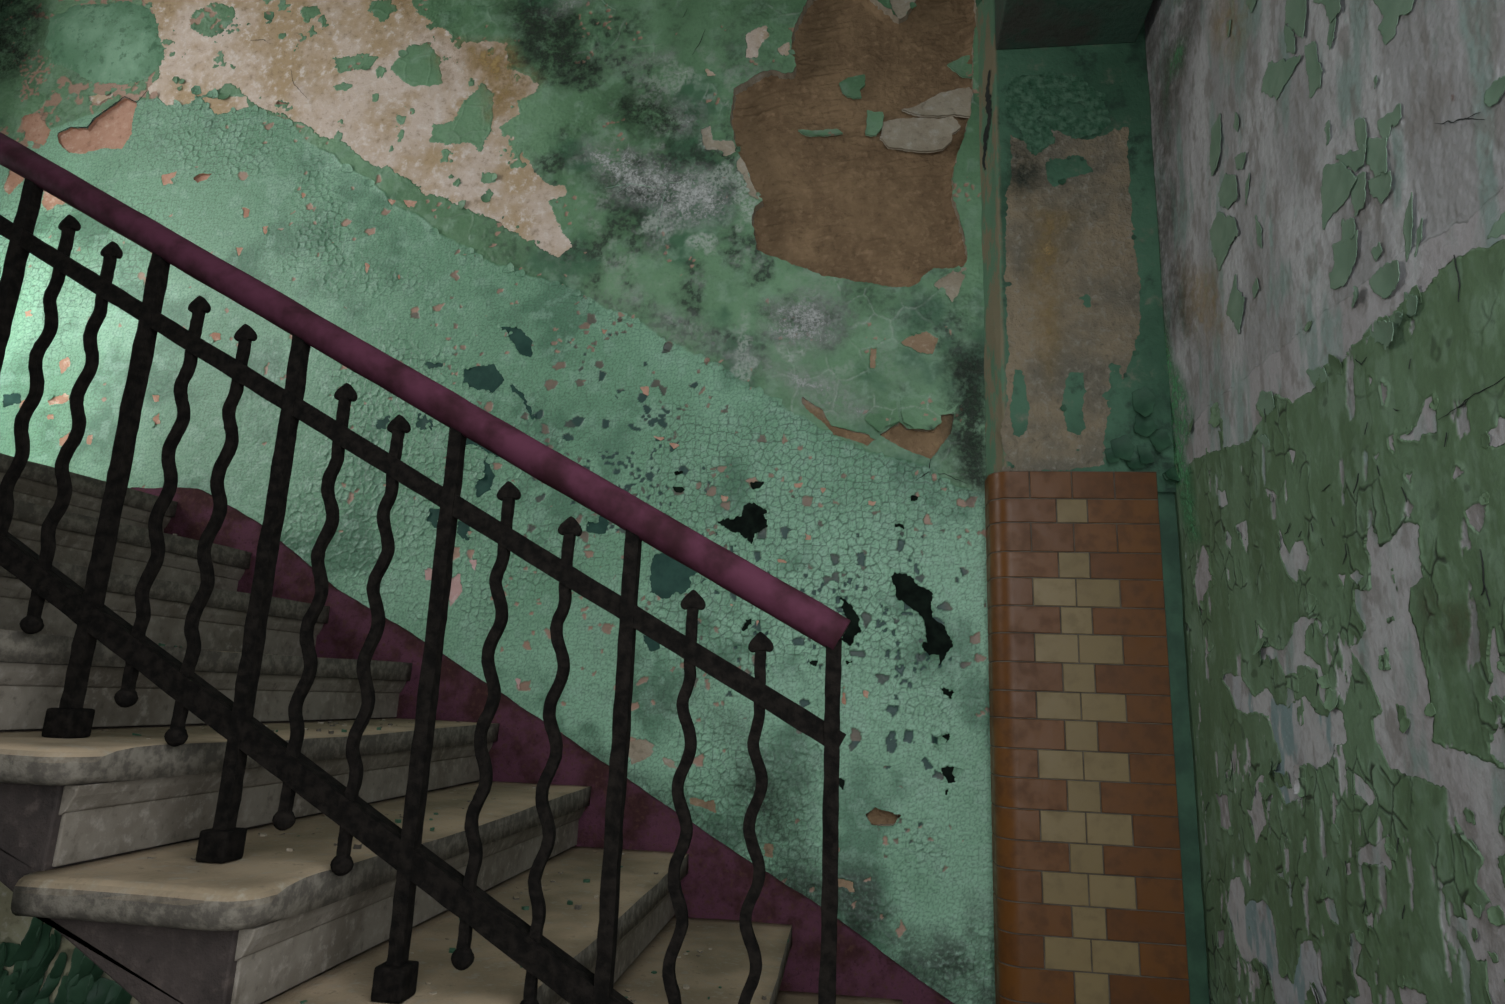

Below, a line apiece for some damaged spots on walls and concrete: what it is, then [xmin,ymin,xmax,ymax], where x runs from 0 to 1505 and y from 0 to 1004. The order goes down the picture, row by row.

peeling [20,0,572,257]
spalling [700,0,977,302]
peeling [716,479,772,544]
peeling [836,597,866,665]
peeling [802,394,958,459]
peeling [884,568,953,668]
peeling [1000,127,1141,471]
peeling [1216,530,1347,843]
peeling [1163,103,1505,483]
peeling [1339,522,1505,1004]
peeling [0,881,141,1004]
peeling [1216,877,1327,1004]